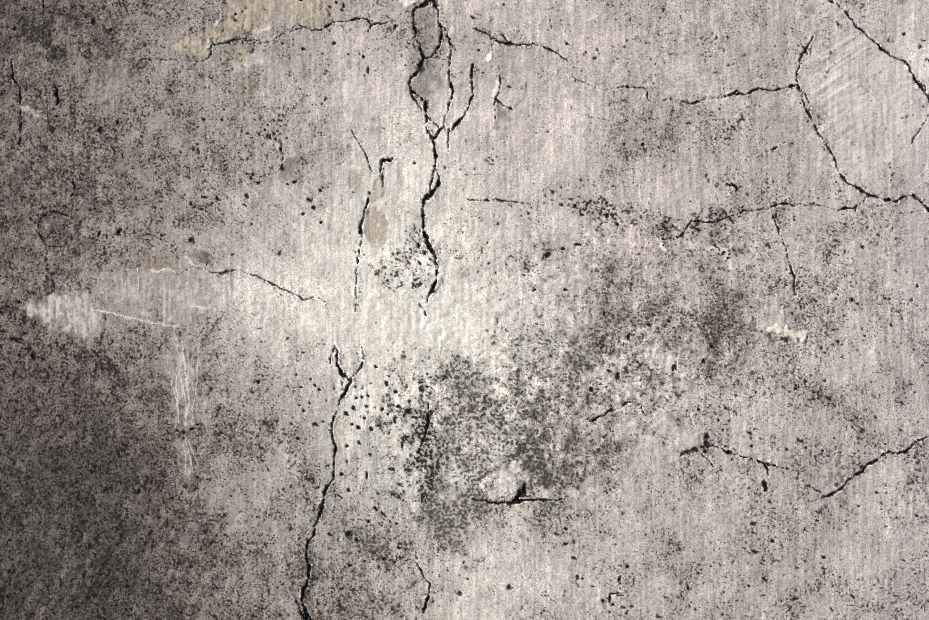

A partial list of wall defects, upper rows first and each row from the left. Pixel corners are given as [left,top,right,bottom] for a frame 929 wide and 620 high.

crack [210,13,389,55]
crack [474,28,566,59]
crack [830,0,929,143]
crack [408,0,510,315]
crack [662,36,929,300]
crack [355,198,369,306]
crack [196,266,325,302]
crack [295,346,364,620]
crack [473,484,565,505]
crack [701,446,795,492]
crack [815,438,923,498]